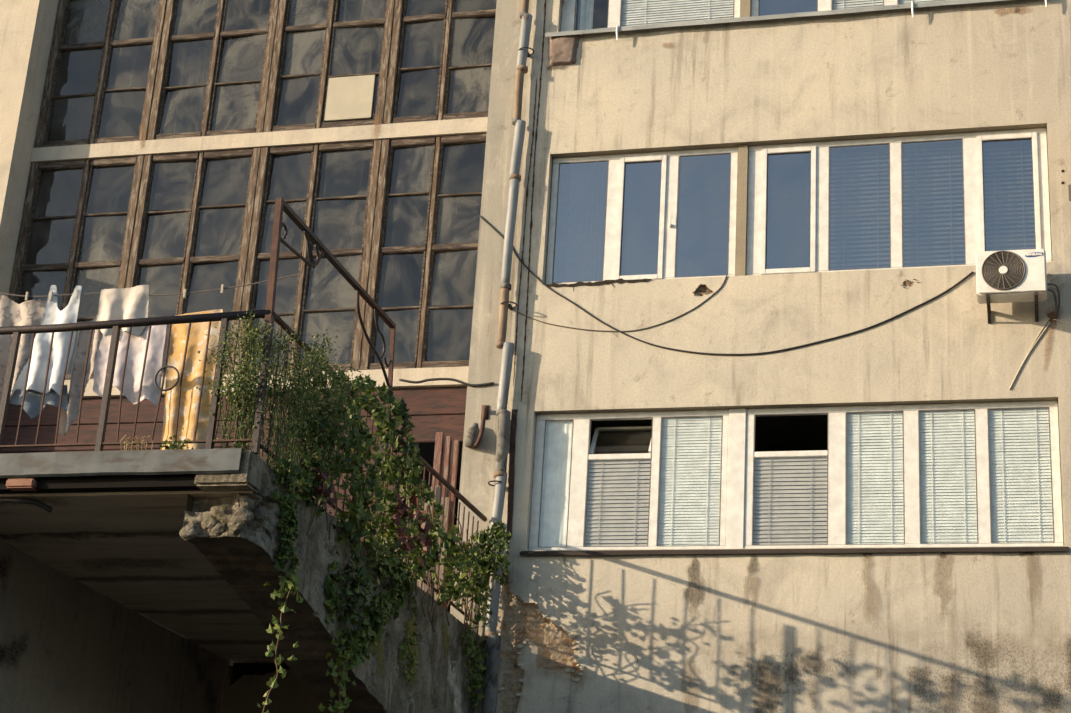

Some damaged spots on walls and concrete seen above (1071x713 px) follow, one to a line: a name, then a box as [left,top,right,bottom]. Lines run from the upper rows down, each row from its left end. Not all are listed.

flaking render [691,284,714,296]
spalling [179,495,269,540]
damp [686,559,704,607]
flaking render [499,572,585,713]